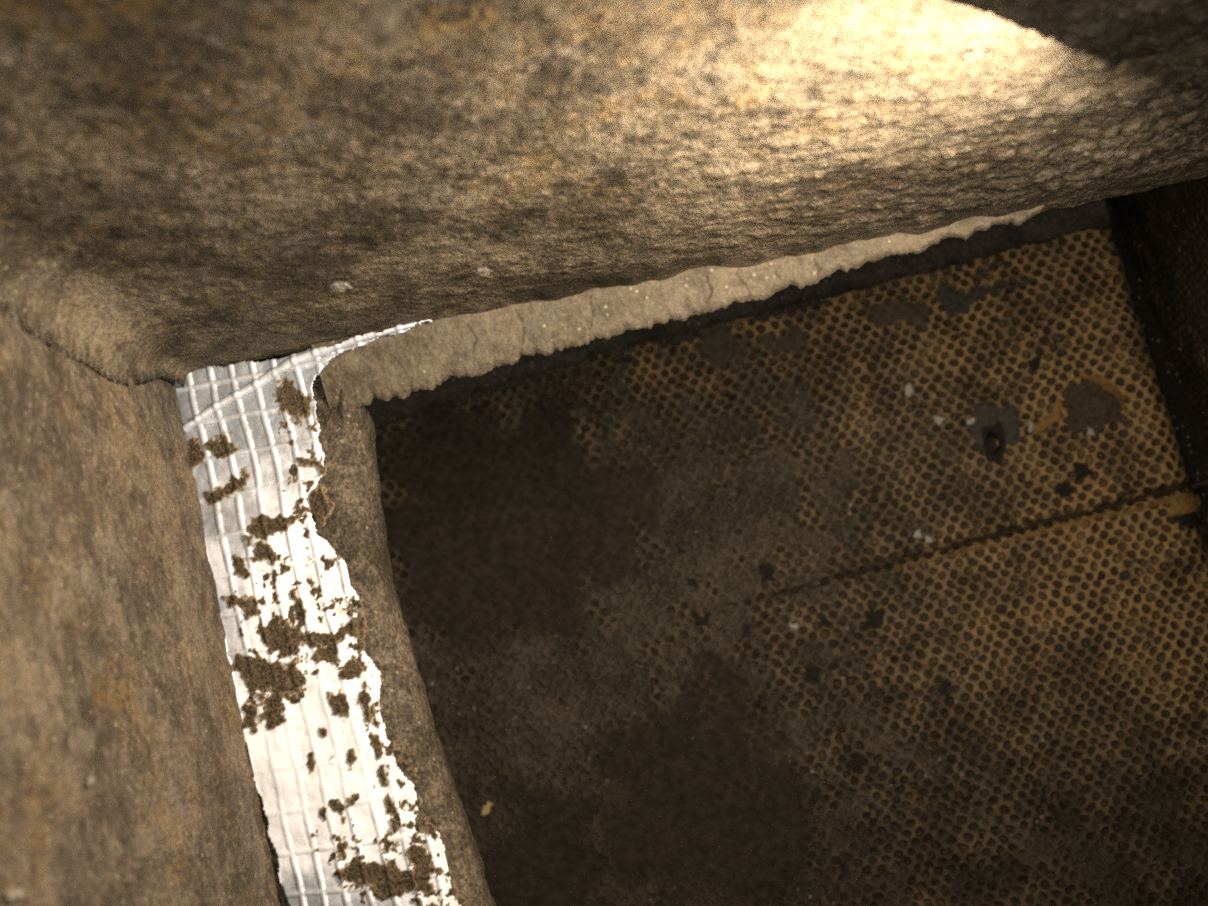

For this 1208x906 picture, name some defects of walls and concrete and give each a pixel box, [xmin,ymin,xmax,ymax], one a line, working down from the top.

water stain [376,402,658,639]
water stain [481,788,599,906]
water stain [599,654,806,904]